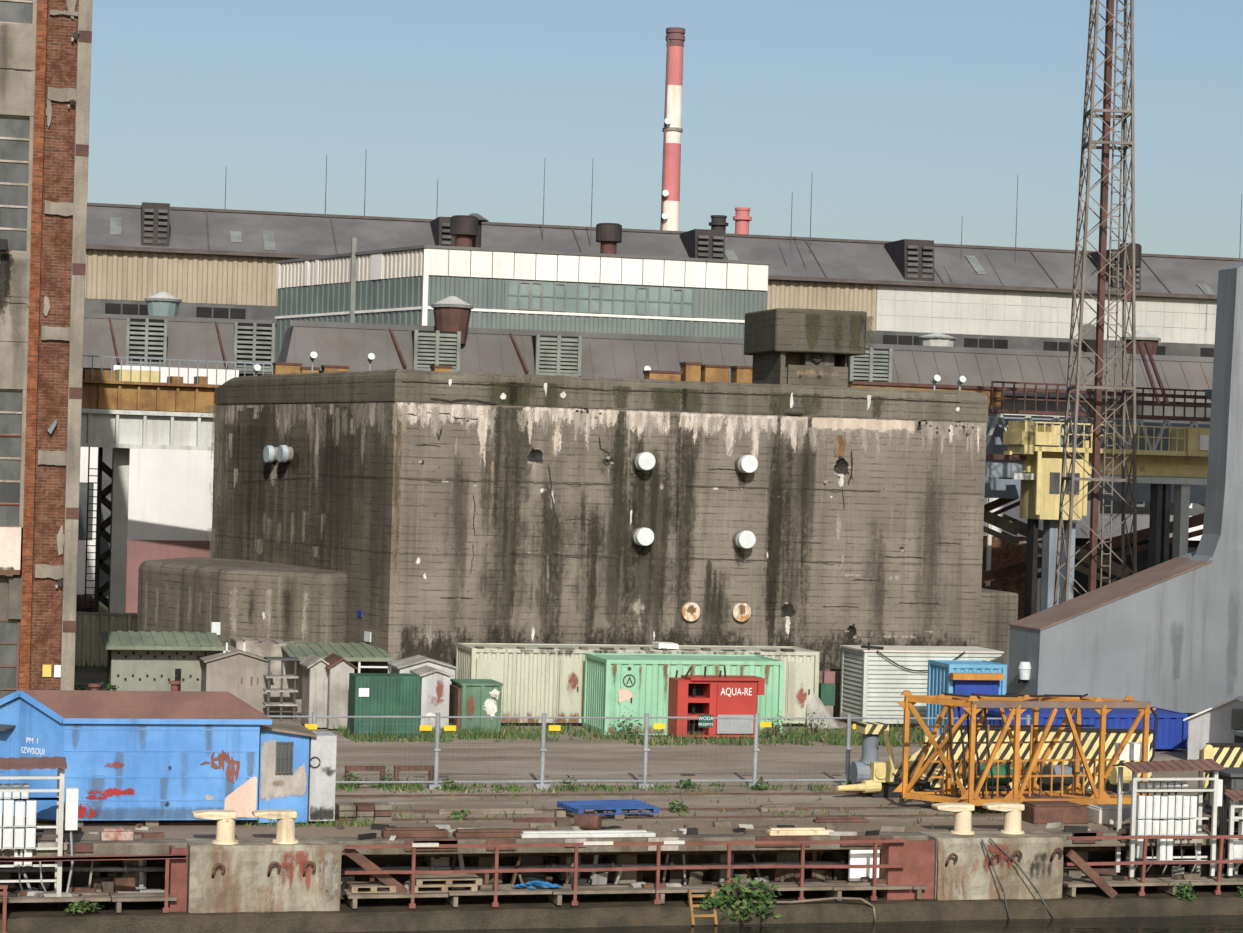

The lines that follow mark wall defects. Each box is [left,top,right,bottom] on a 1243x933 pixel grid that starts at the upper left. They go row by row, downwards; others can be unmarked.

leakage [206,383,816,646]
peeling [808,417,977,487]